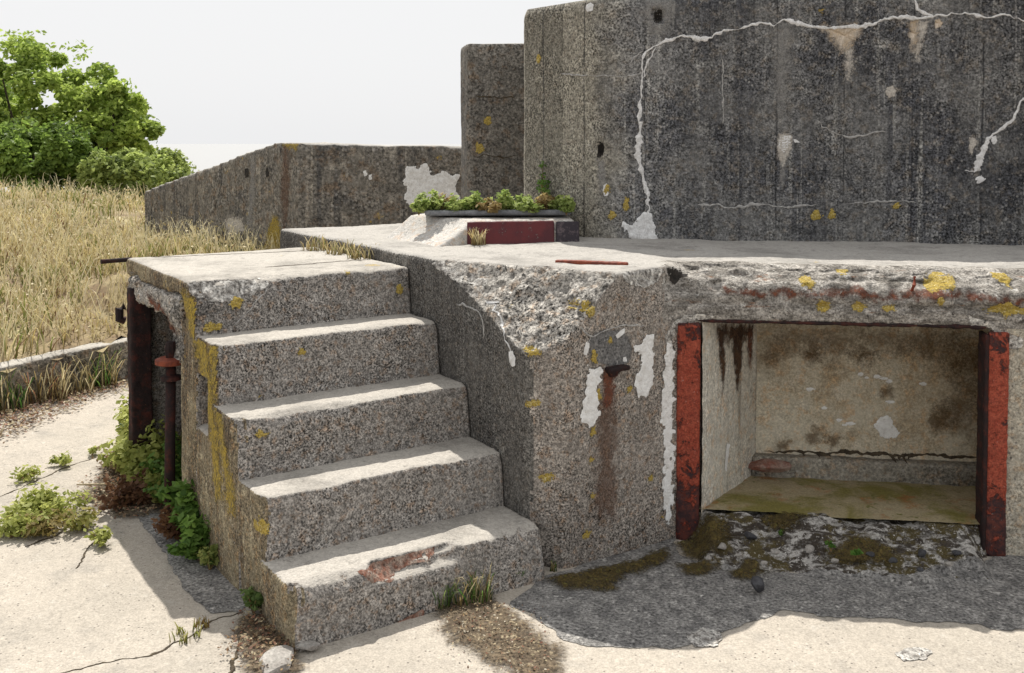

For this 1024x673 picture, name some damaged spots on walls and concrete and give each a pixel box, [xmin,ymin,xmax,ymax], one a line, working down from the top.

crack [562,0,1024,239]
peeling [401,163,461,205]
corrosion [724,285,1022,306]
peeling [580,342,604,428]
corrosion [603,370,616,408]
peeling [623,314,714,525]
corrosion [717,323,754,390]